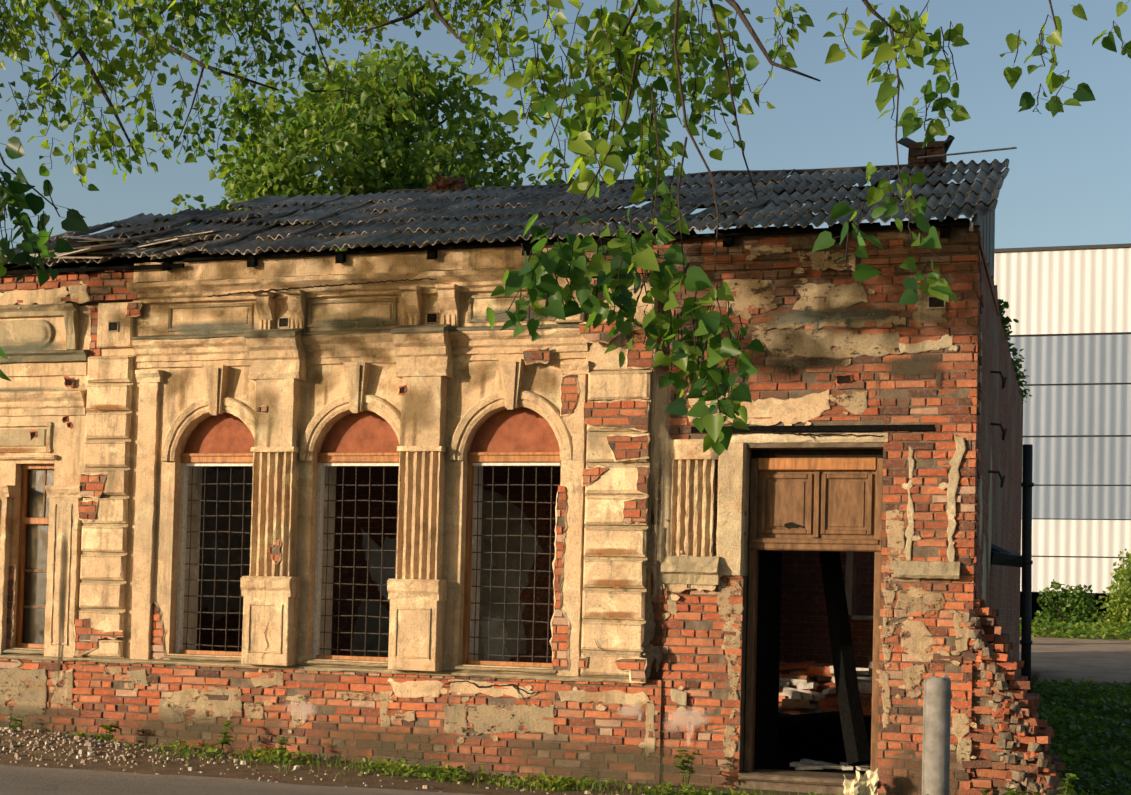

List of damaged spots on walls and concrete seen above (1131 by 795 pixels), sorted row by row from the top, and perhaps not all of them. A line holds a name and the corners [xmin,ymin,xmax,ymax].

peeling [0,281,102,356]
flaking render [125,301,142,318]
peeling [687,245,957,426]
flaking render [77,472,108,521]
flaking render [560,374,698,562]
peeling [478,485,589,671]
peeling [876,434,970,729]
crack [446,681,539,701]
peeling [339,657,658,758]
peeling [661,556,744,772]
peeling [950,706,977,769]